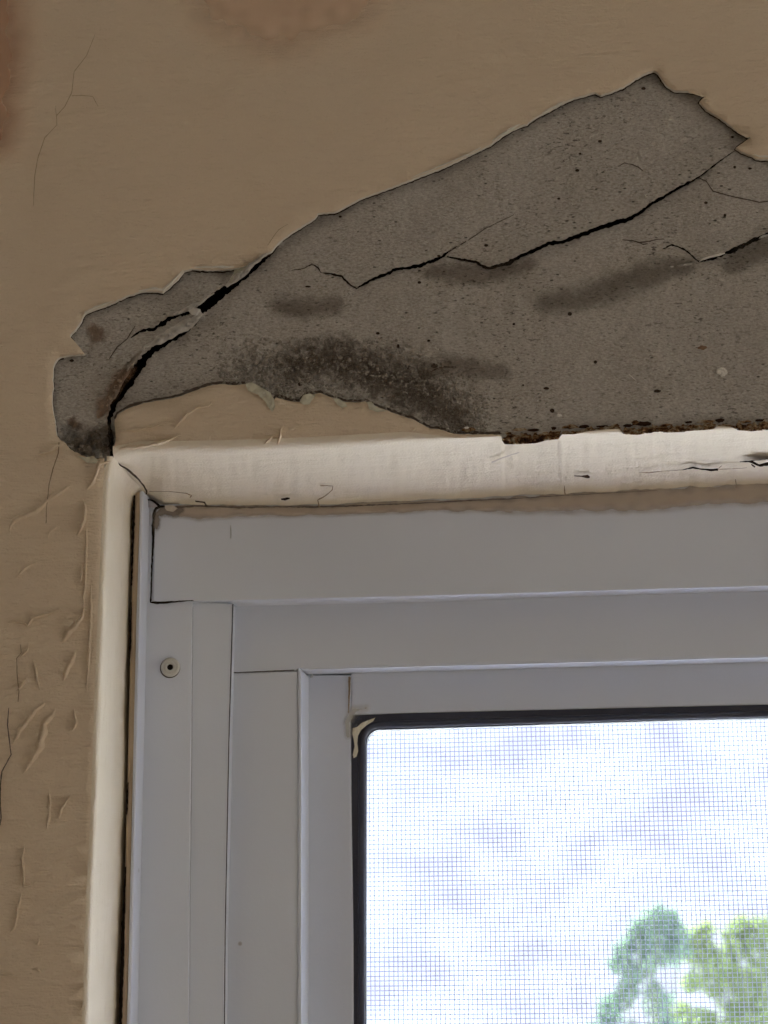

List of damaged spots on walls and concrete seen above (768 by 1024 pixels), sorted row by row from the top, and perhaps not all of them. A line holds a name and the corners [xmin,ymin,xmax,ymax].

spalling [53,73,768,461]
crack [291,151,768,289]
crack [97,224,288,506]
crack [46,442,60,523]
crack [0,644,22,825]